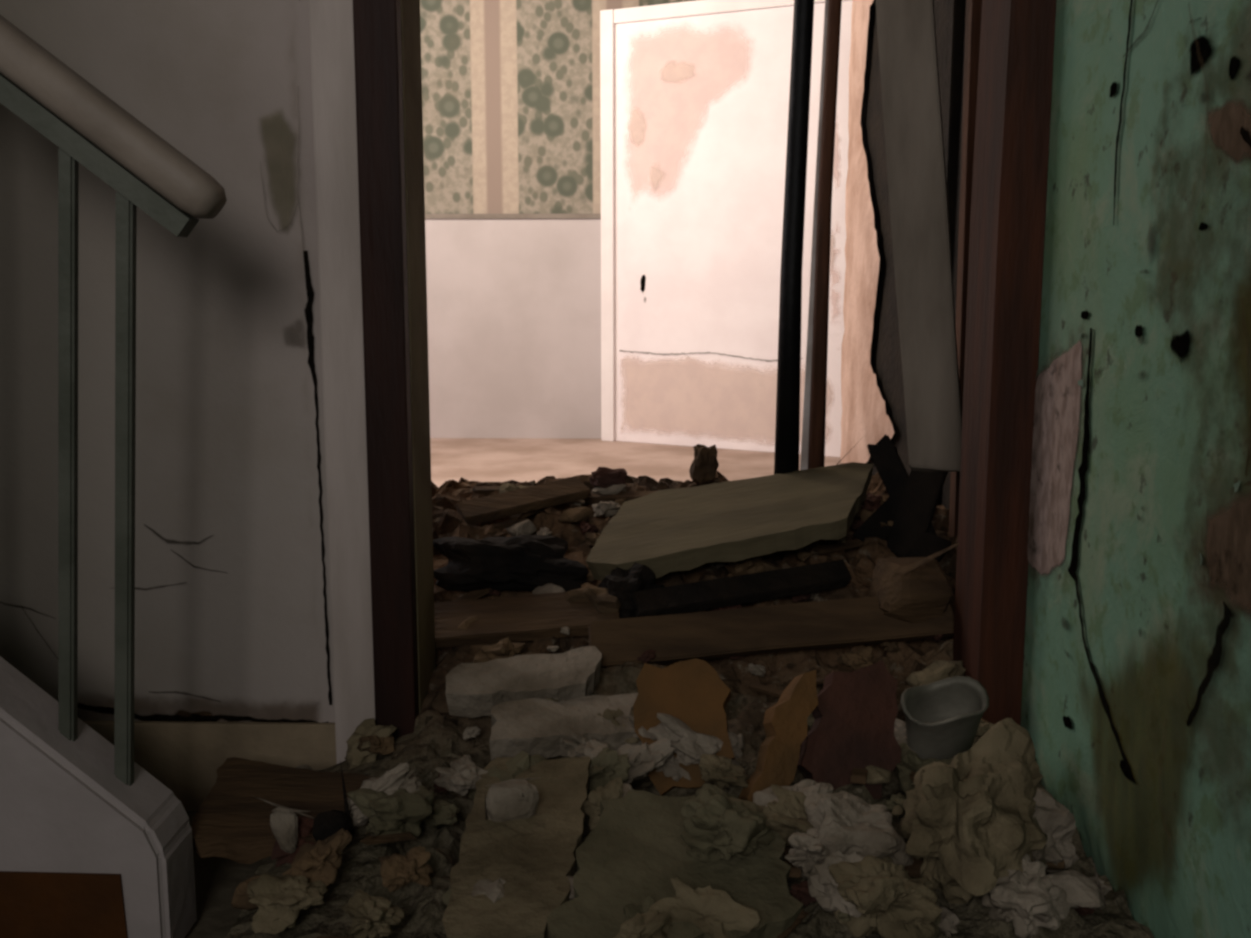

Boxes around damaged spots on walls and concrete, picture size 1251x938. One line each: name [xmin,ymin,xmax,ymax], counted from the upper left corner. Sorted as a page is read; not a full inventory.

peeling [1189,36,1212,75]
peeling [1229,56,1251,80]
peeling [629,32,746,191]
peeling [1208,100,1251,162]
peeling [1170,330,1190,362]
peeling [619,350,778,442]
crack [78,250,332,723]